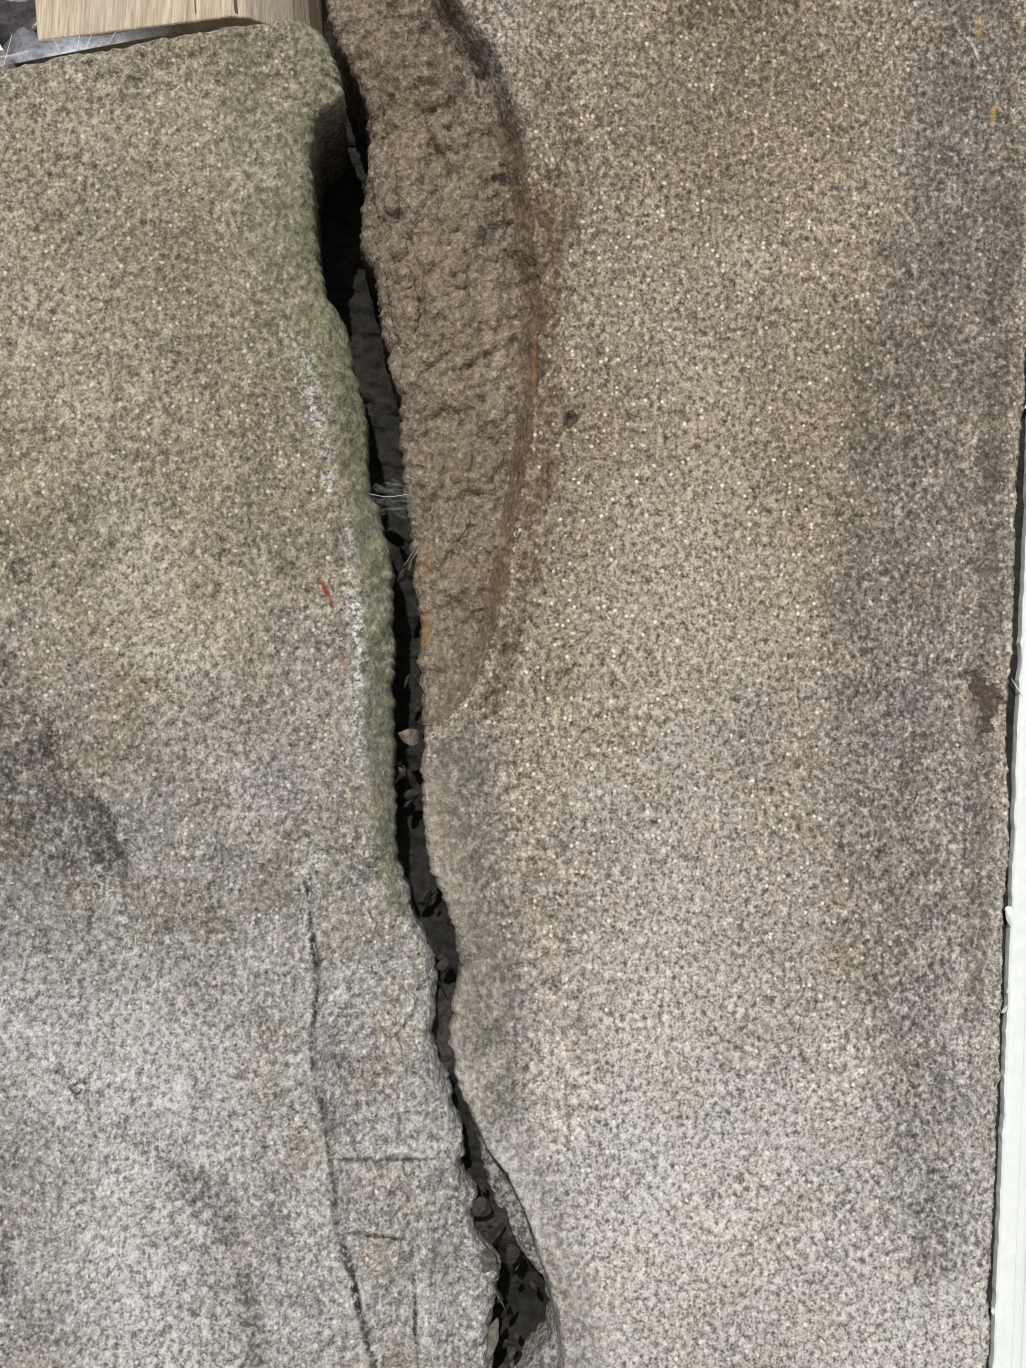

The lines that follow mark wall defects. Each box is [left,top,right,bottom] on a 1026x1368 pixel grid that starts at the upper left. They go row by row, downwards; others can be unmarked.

crack [323,21,334,59]
crack [320,103,549,1368]
crack [305,881,319,1068]